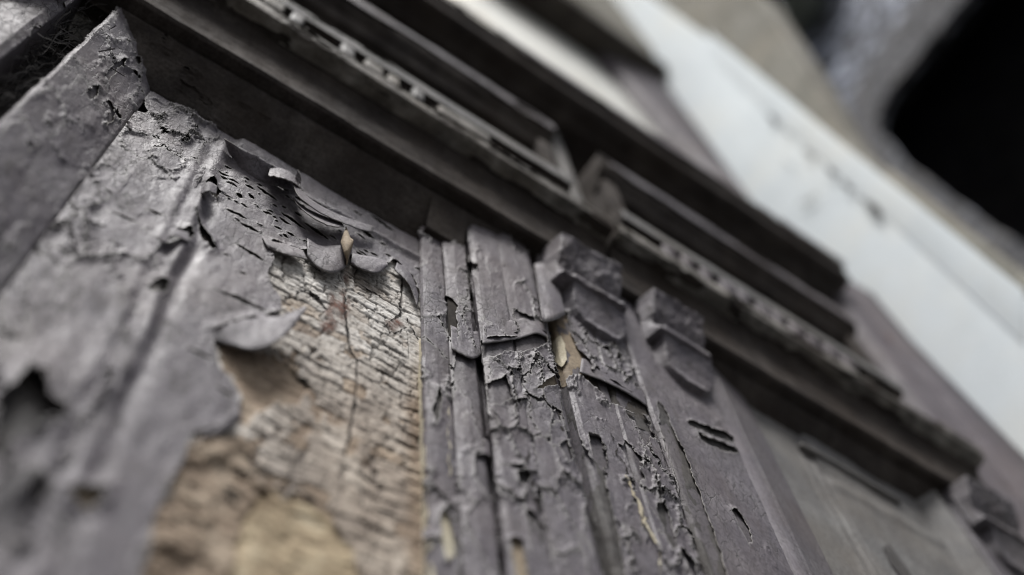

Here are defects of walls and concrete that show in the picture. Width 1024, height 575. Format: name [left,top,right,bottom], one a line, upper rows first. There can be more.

peeling [0,369,49,453]
crack [170,173,422,521]
peeling [140,138,726,575]